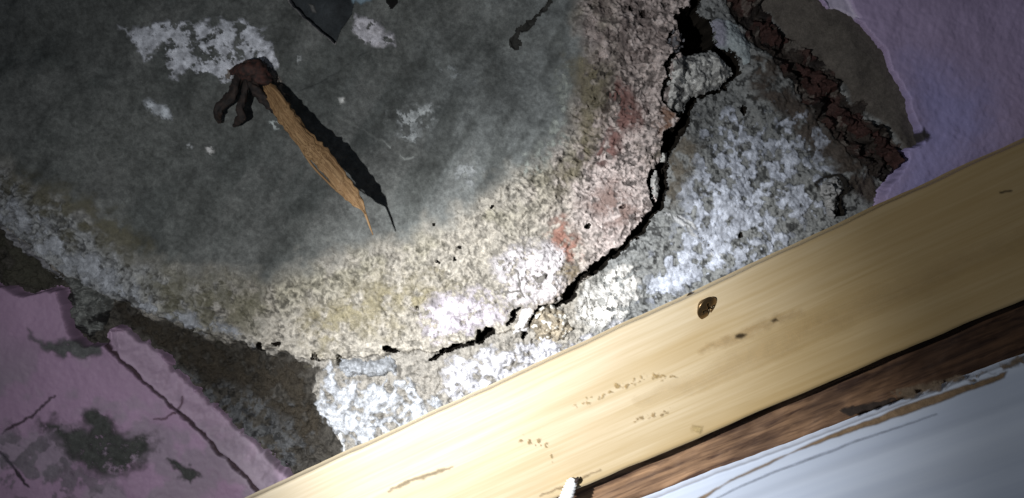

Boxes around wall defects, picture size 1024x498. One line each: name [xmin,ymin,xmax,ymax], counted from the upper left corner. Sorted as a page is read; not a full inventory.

spalling [288,0,369,44]
water stain [0,56,876,452]
crack [428,0,742,361]
spalling [727,0,905,182]
spalling [814,174,851,220]